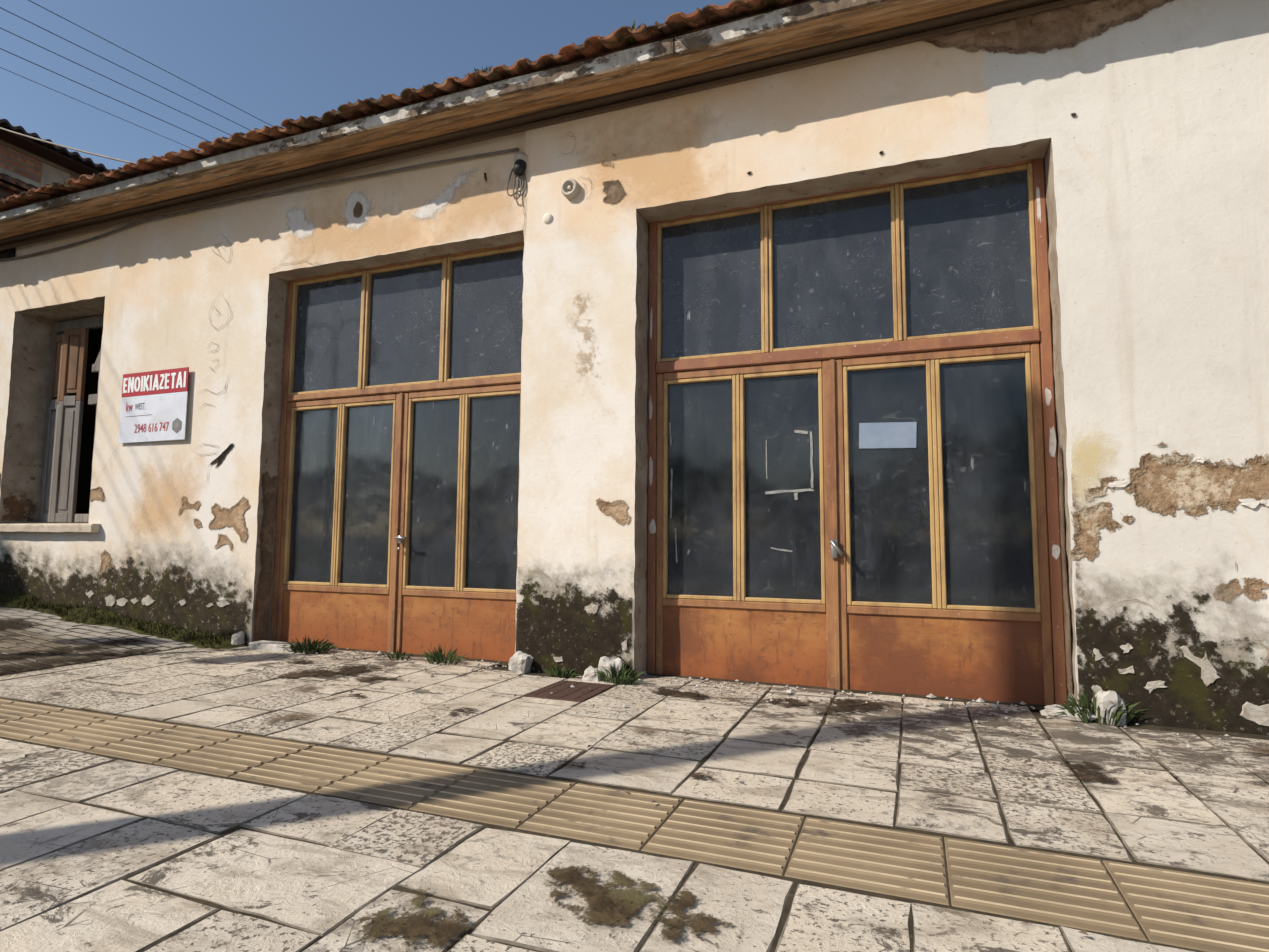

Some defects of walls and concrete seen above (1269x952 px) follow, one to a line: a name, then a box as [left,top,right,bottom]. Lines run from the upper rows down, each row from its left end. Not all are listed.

spalling [601,153,626,204]
water stain [0,542,252,646]
spalling [178,472,277,642]
water stain [516,568,634,676]
spalling [596,498,630,526]
spalling [1049,426,1269,693]
water stain [1074,564,1269,736]